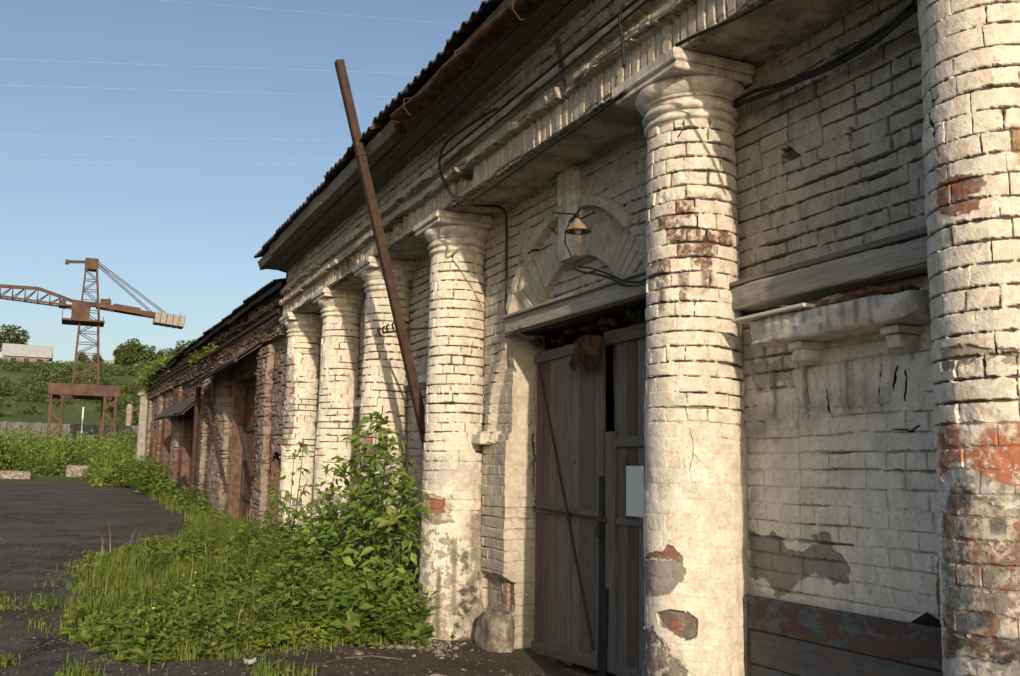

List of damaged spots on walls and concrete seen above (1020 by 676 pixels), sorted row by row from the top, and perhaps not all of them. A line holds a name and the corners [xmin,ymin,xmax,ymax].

flaking render [934,143,987,245]
crack [878,365,907,400]
crack [893,425,921,433]
peeling [421,494,456,641]
peeling [644,544,686,597]
peeling [748,530,851,599]
spalling [911,421,1020,664]
peeling [642,609,698,676]